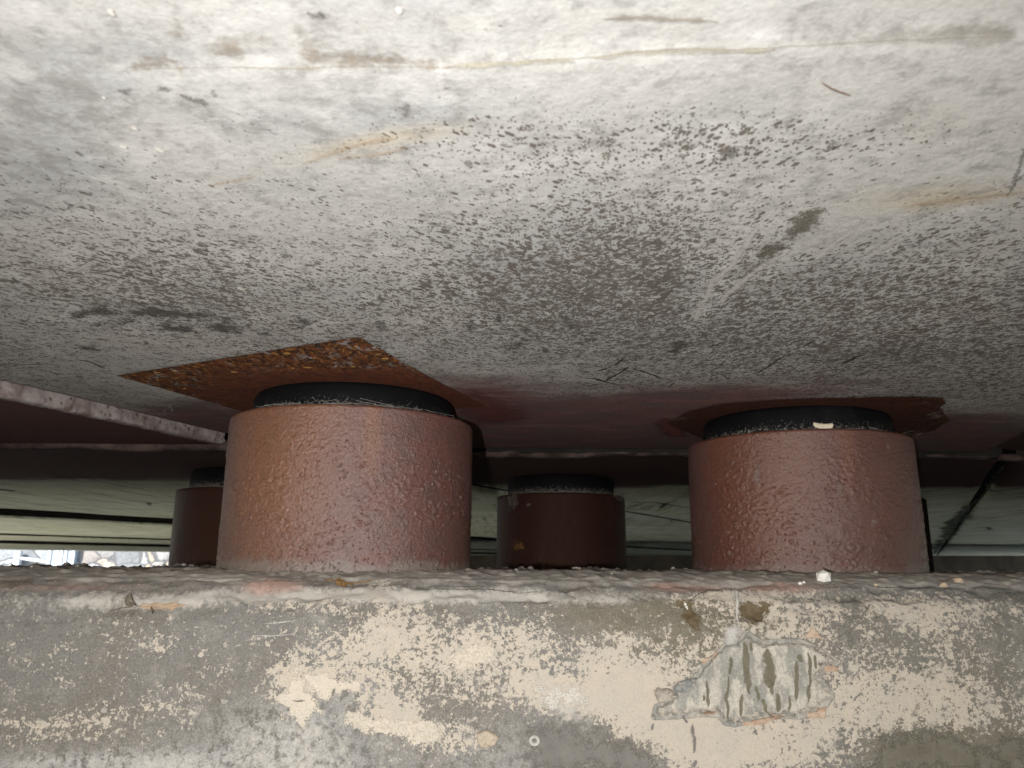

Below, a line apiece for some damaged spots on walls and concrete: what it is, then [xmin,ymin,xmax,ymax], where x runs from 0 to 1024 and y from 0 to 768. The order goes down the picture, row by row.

leakage [720,219,861,306]
leakage [47,303,243,334]
spalling [651,627,841,727]